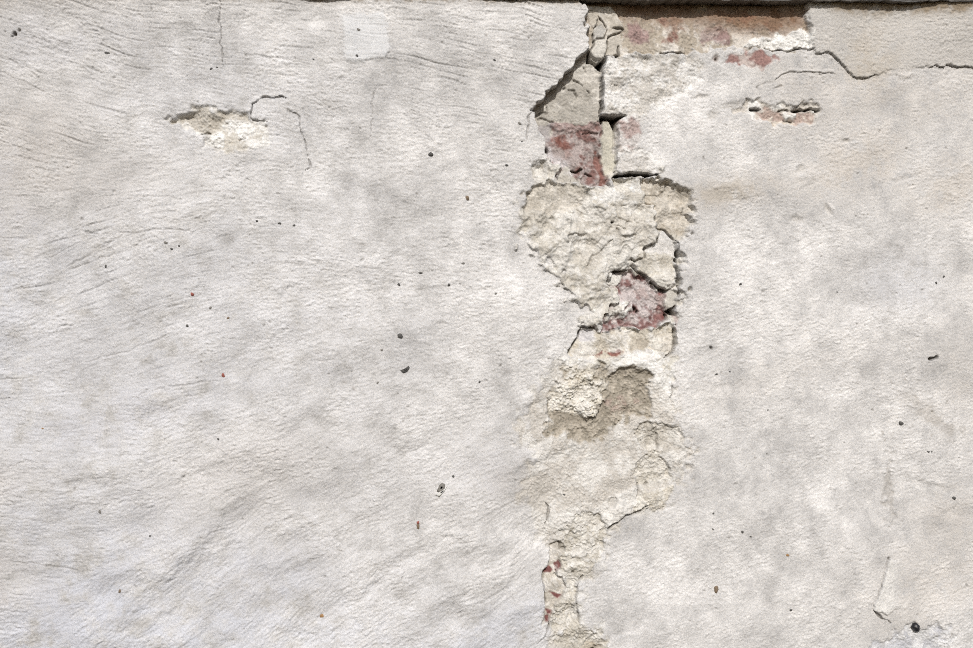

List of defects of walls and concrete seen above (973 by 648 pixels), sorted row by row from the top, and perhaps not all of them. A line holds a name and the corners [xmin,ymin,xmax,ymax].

crack [774,52,877,82]
flaking render [166,106,269,155]
flaking render [513,2,821,648]
flaking render [869,622,957,648]